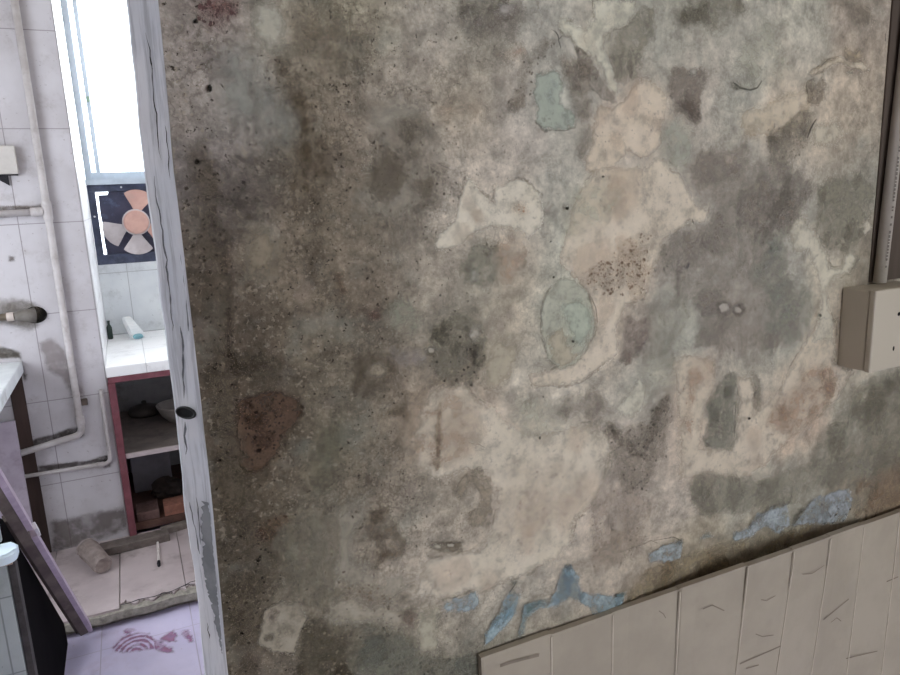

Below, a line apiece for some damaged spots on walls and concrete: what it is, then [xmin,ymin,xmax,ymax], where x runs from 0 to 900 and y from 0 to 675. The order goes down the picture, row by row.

peeling [435,179,543,249]
peeling [530,81,708,386]
leakage [690,369,900,516]
peeling [414,386,610,651]
leakage [294,615,478,675]